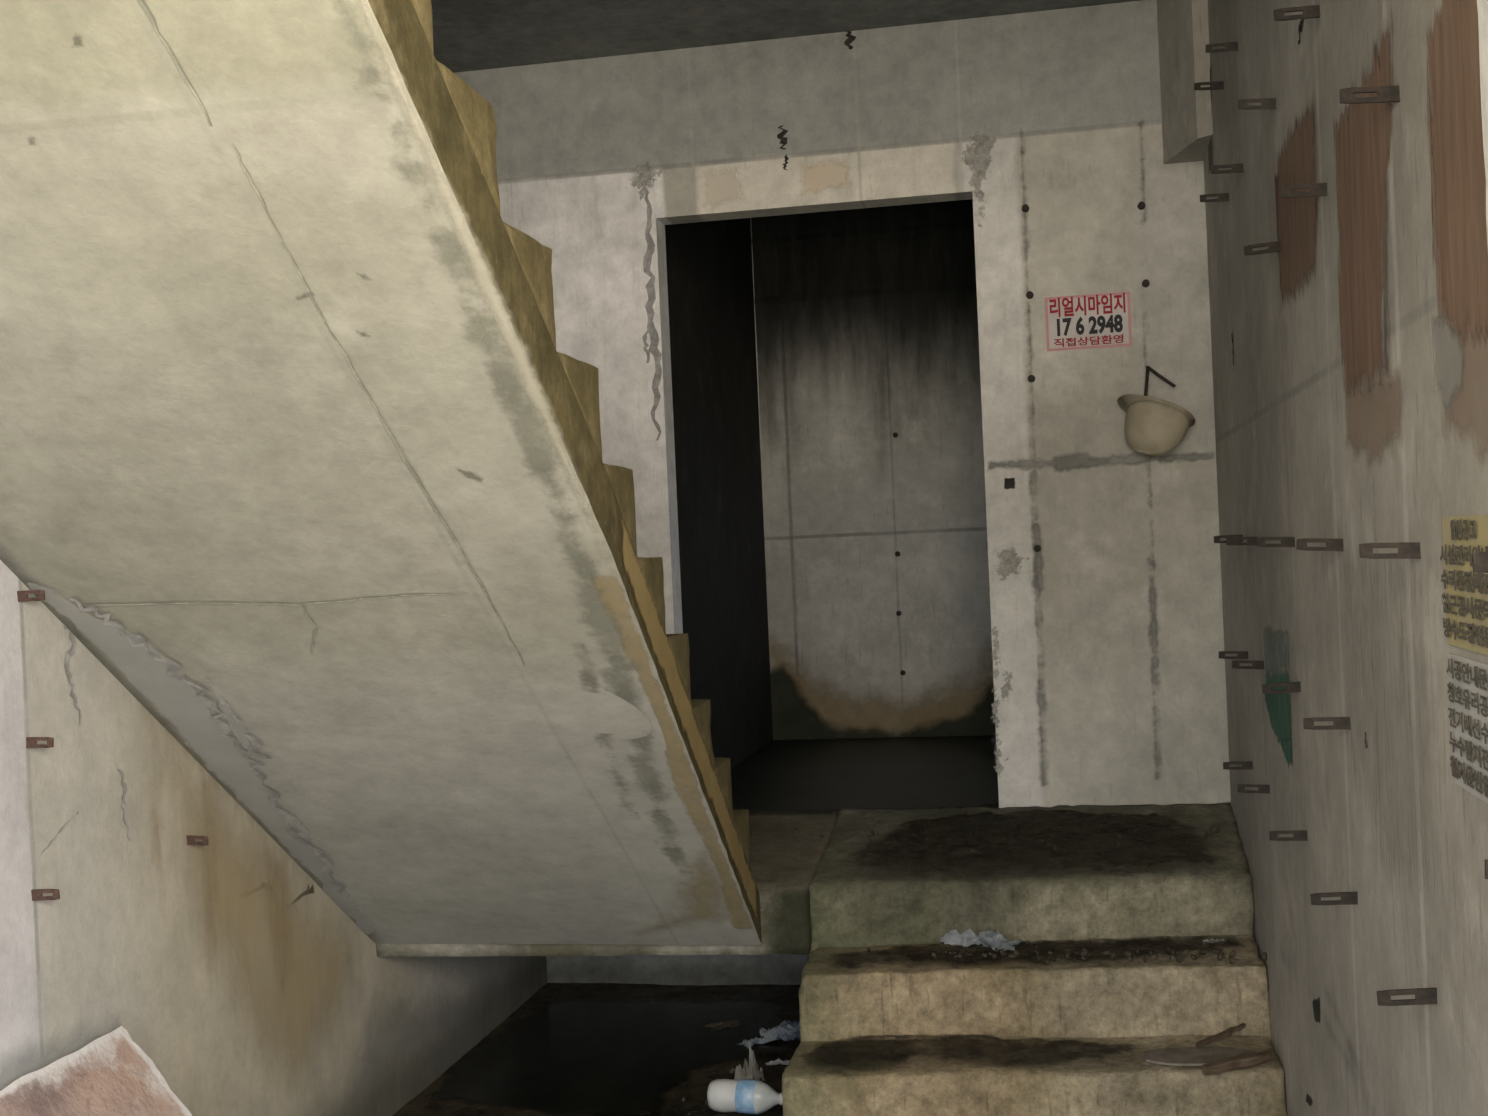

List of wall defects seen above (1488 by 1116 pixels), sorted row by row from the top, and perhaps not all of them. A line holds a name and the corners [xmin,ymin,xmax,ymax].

peeling [1275,101,1317,302]
peeling [1334,24,1401,461]
peeling [1427,0,1488,454]
crack [63,0,525,726]
leakage [471,318,560,495]
leakage [576,559,634,705]
leakage [770,645,996,740]
crack [40,811,79,857]
crack [117,768,131,841]